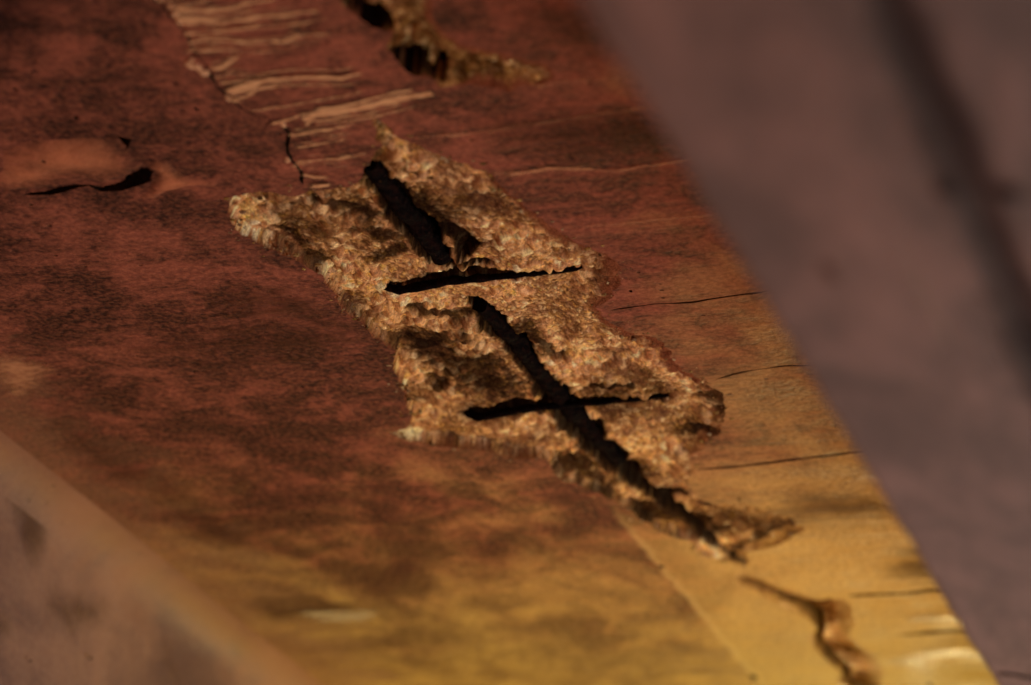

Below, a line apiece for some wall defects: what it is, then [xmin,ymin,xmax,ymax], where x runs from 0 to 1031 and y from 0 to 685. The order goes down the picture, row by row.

spalling [340,0,555,92]
peeling [139,160,218,199]
crack [613,292,760,310]
spalling [224,111,812,571]
crack [718,365,803,379]
crack [698,451,856,470]
crack [733,572,939,685]